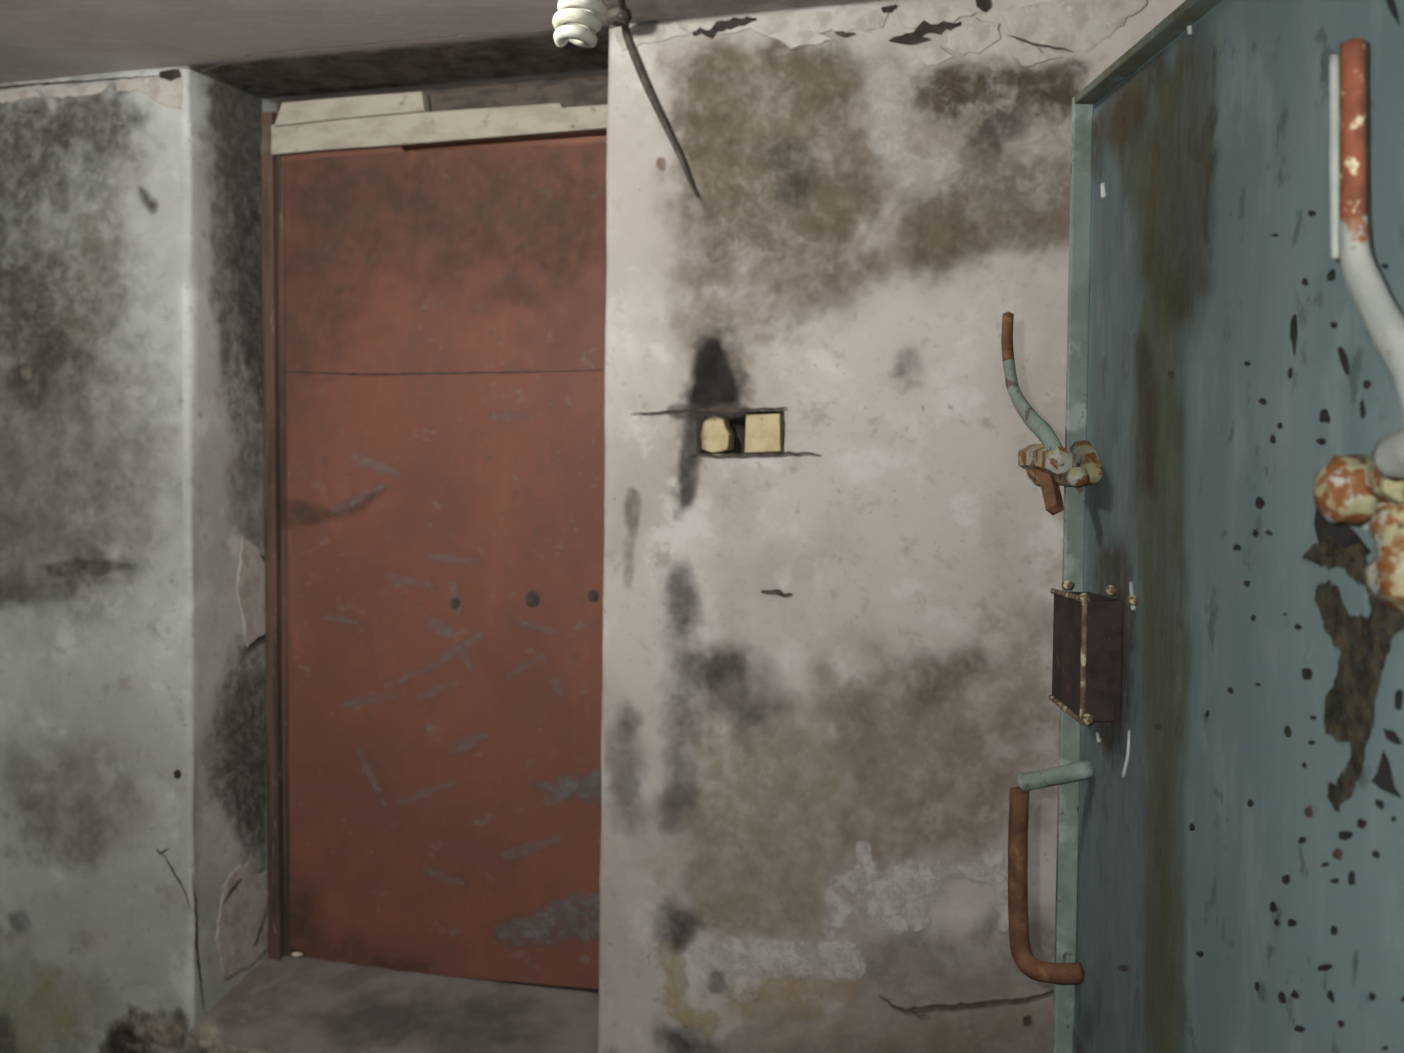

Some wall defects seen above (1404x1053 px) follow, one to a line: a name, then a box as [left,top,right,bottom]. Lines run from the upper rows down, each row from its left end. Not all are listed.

flaking render [613,0,1147,67]
water stain [868,59,1081,191]
crack [631,407,695,415]
water stain [669,340,739,503]
peeling [1302,668,1313,680]
peeling [1394,690,1403,710]
water stain [693,841,1009,1005]
crack [878,989,1054,1017]
spalling [100,1007,233,1053]